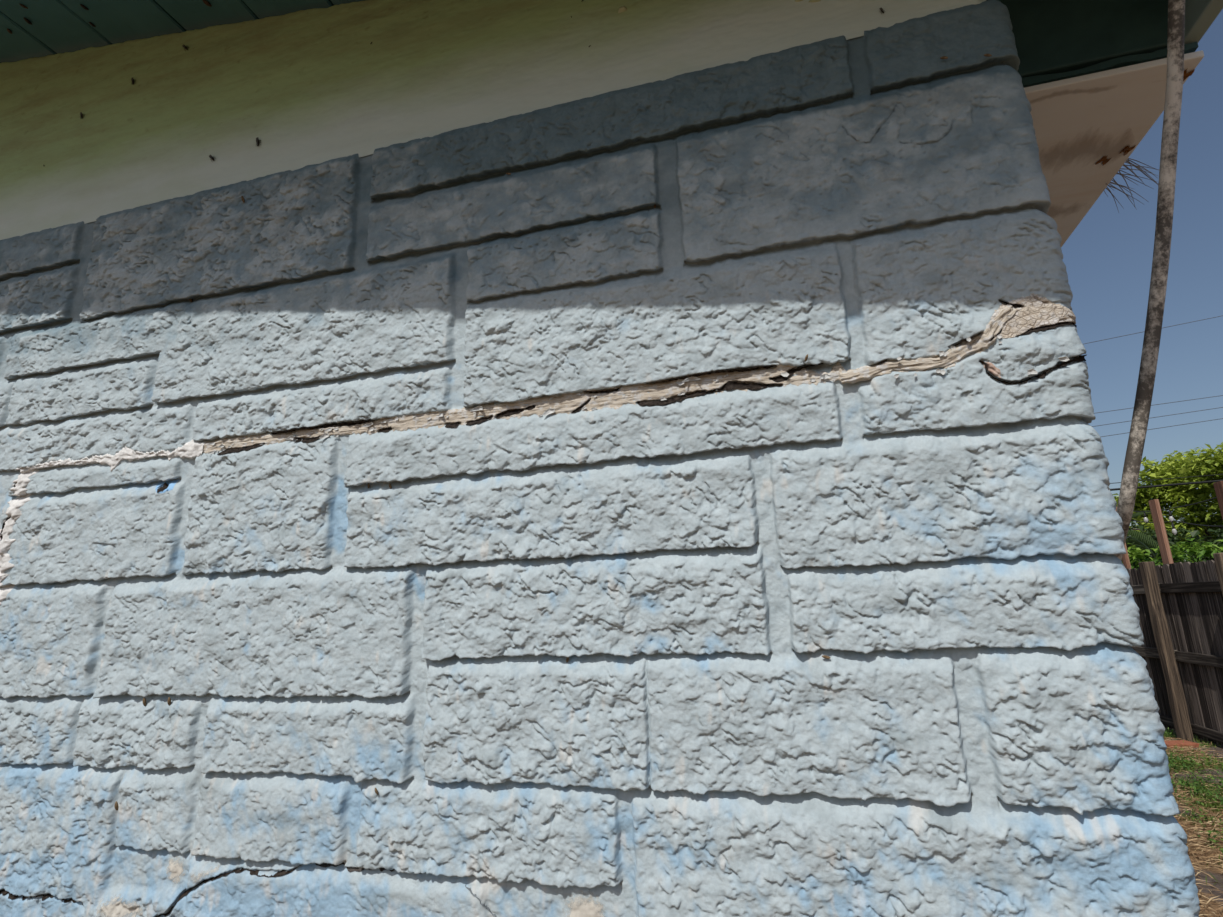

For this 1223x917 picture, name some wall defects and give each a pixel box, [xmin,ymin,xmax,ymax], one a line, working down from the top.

crack [0,339,1086,605]
crack [0,889,83,905]
crack [156,862,422,917]
crack [465,885,497,917]